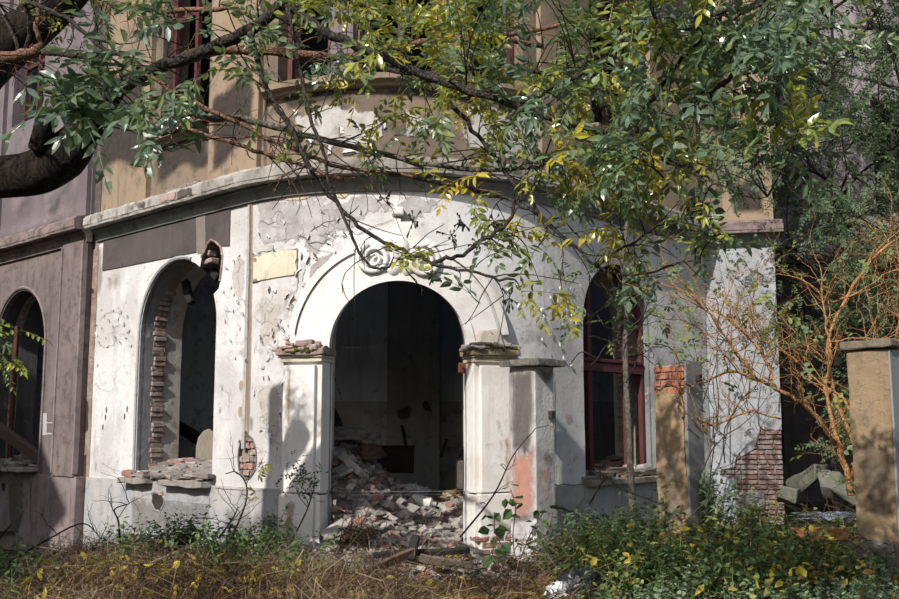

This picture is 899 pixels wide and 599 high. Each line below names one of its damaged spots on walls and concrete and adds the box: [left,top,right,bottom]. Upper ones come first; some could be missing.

peeling [200,192,437,480]
leakage [506,371,547,515]
spalling [720,418,785,515]